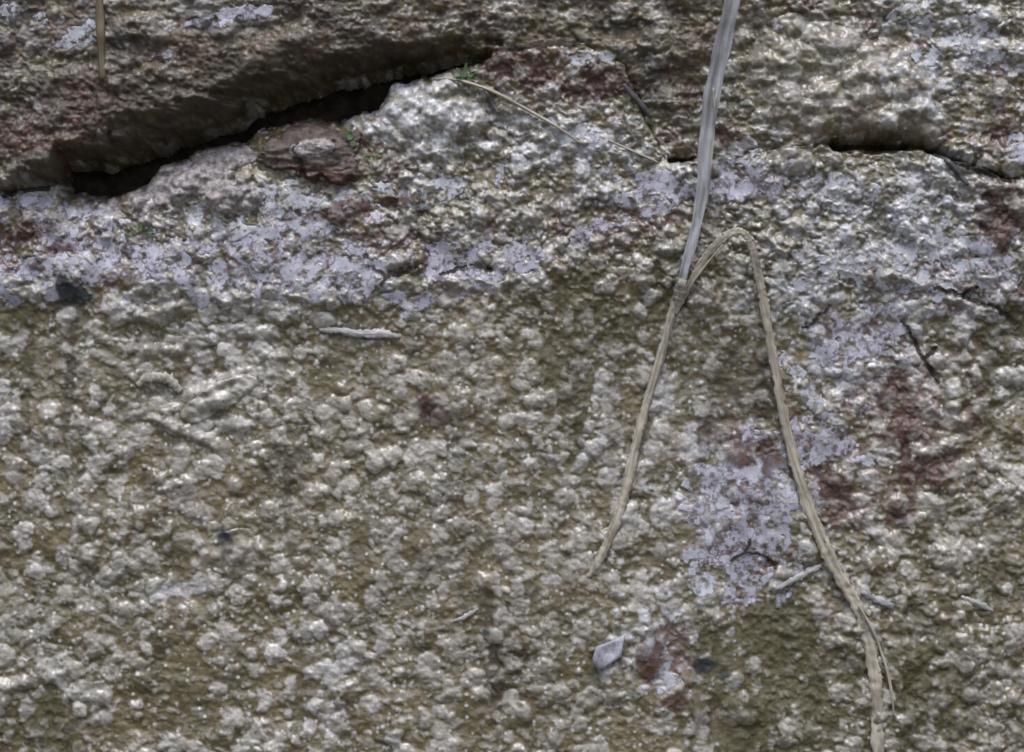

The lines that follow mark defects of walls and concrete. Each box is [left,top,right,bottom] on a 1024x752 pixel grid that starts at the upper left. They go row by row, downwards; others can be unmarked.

crack [0,39,580,198]
crack [829,144,903,152]
crack [932,154,1012,183]